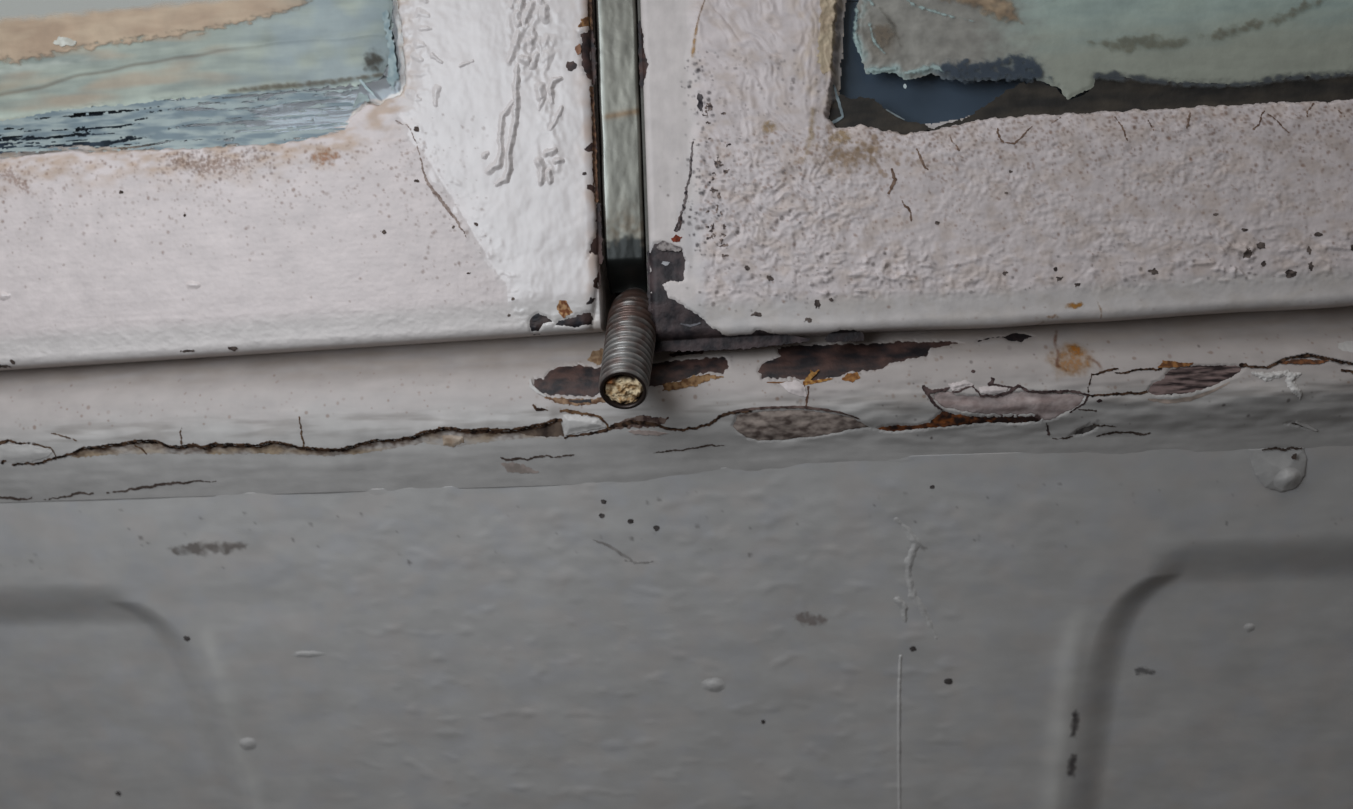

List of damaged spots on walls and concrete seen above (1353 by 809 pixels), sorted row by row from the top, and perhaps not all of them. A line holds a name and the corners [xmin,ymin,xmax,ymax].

peeling [53,36,77,47]
peeling [646,215,1150,441]
peeling [529,348,605,406]
peeling [1148,360,1243,404]
crack [0,404,752,501]